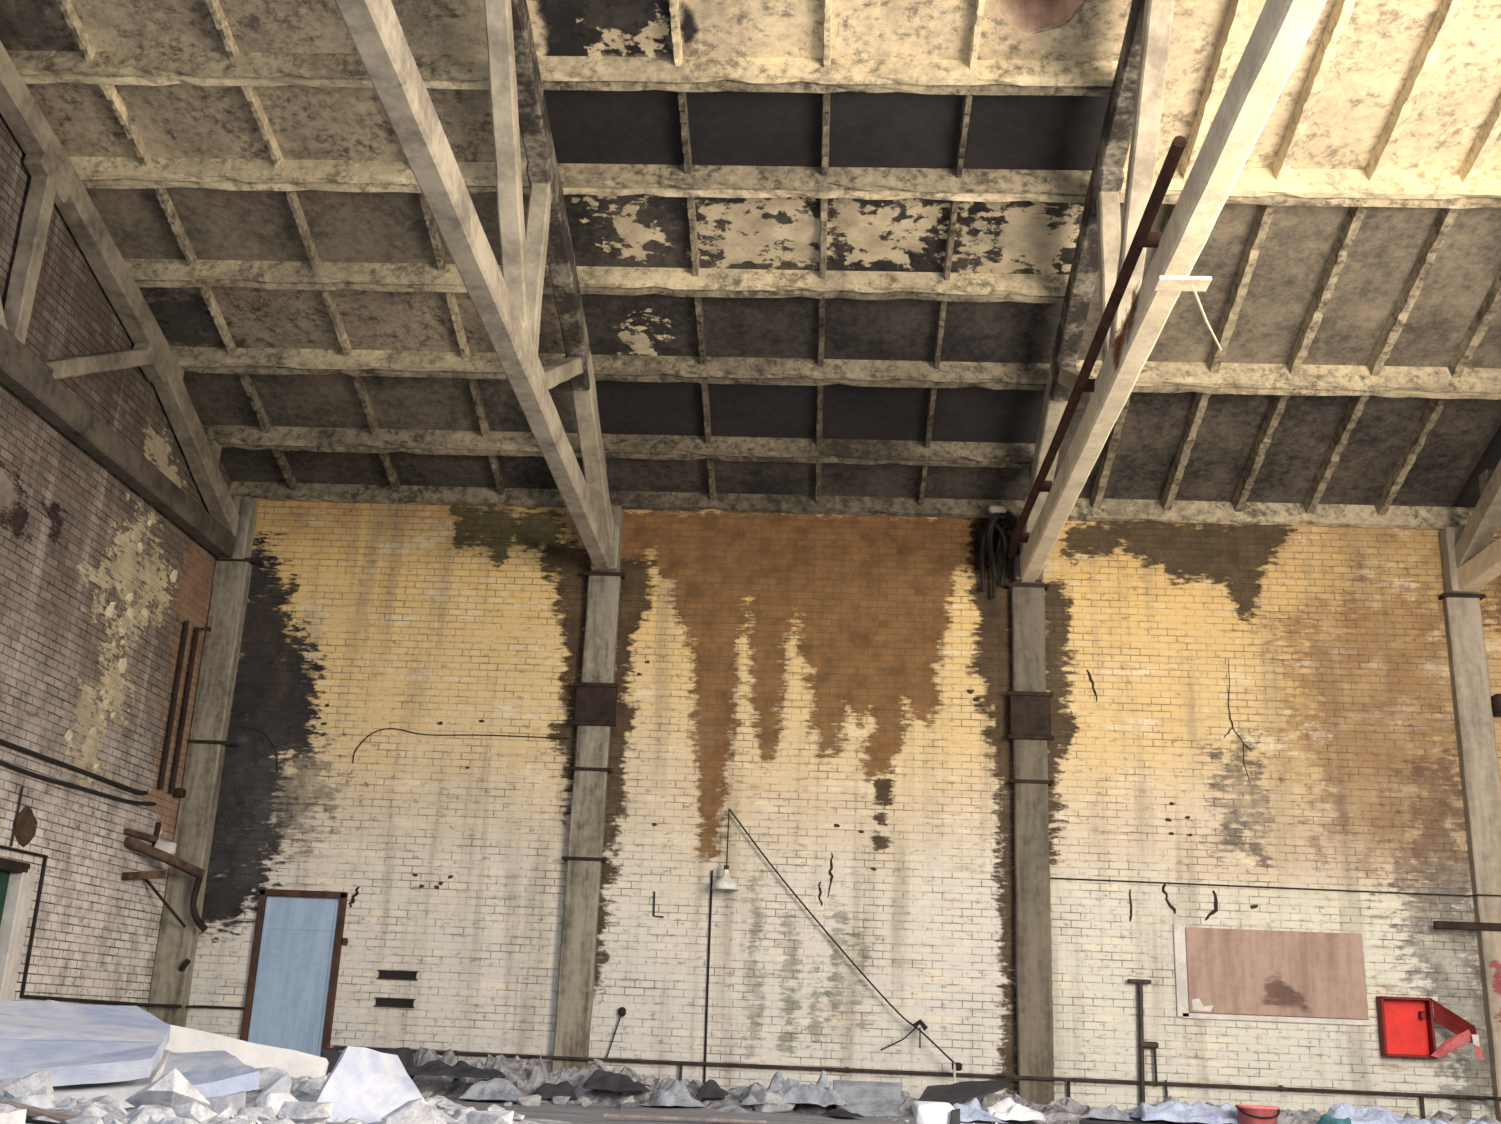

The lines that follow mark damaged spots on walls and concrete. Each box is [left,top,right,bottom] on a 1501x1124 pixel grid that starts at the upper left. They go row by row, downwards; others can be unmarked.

peeling [576,5,685,58]
spalling [571,195,670,264]
spalling [682,197,1084,275]
rust [1112,282,1139,372]
peeling [60,493,216,842]
water stain [443,505,591,825]
water stain [594,510,1017,1094]
water stain [1041,521,1298,866]